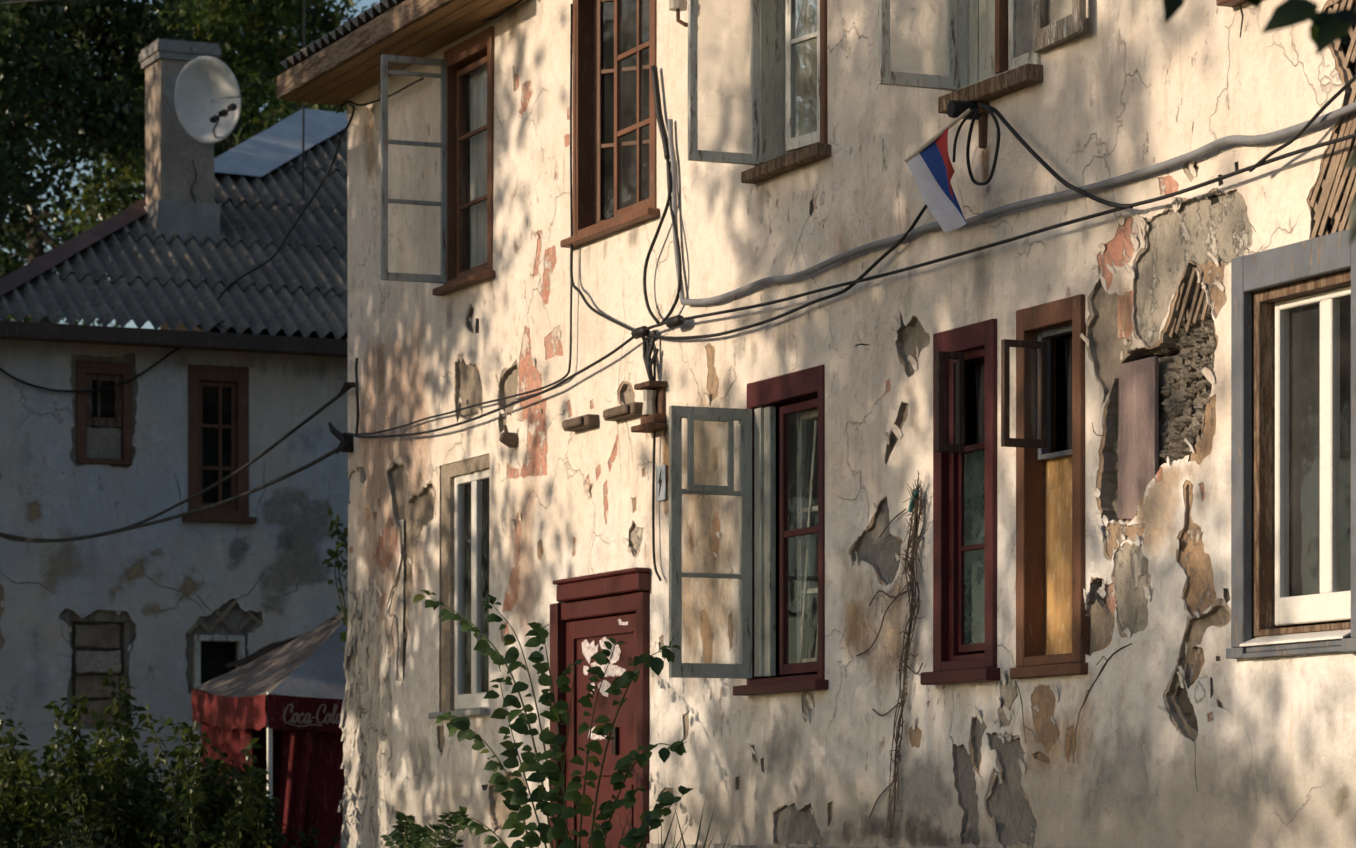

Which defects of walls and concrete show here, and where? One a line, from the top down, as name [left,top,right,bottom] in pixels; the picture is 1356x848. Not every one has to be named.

peeling [891,311,930,378]
peeling [454,325,563,479]
peeling [884,379,909,465]
spalling [1080,159,1253,656]
peeling [584,434,619,524]
spalling [185,598,263,694]
peeling [348,461,436,682]
peeling [848,496,903,586]
spalling [1157,480,1231,742]
peeling [746,743,765,773]
peeling [952,667,1075,848]
peeling [773,801,833,847]